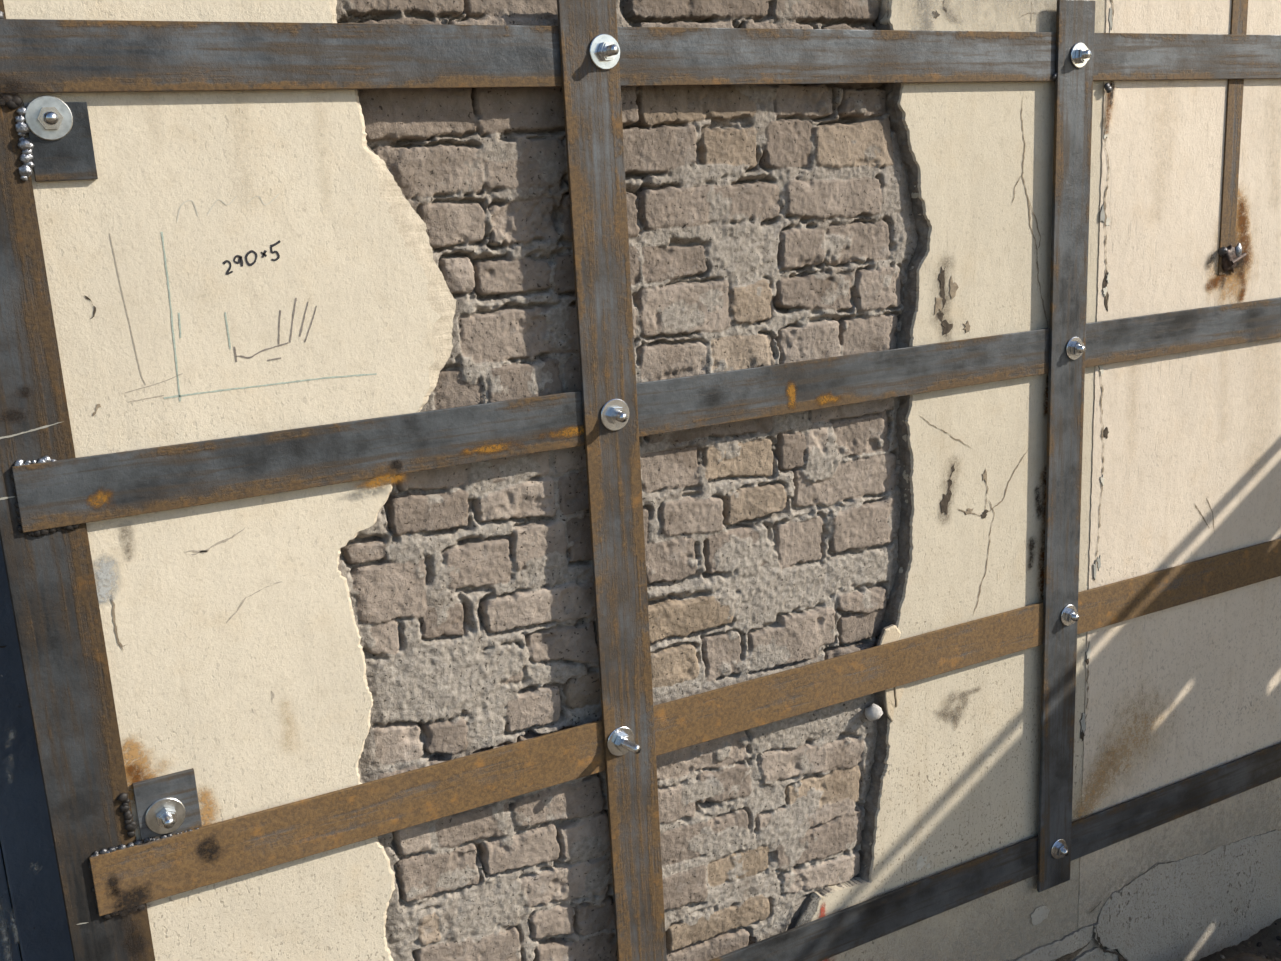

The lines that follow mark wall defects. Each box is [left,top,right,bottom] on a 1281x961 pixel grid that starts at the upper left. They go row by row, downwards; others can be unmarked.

flaking render [355,87,581,412]
flaking render [620,83,932,383]
crack [1012,93,1048,328]
rust [1207,189,1251,301]
flaking render [337,445,602,784]
flaking render [639,394,915,706]
crack [957,447,1030,615]
rust [122,739,158,804]
rust [198,791,217,826]
flaking render [376,771,617,961]
flaking render [656,685,904,961]
flaking render [1007,829,1281,961]